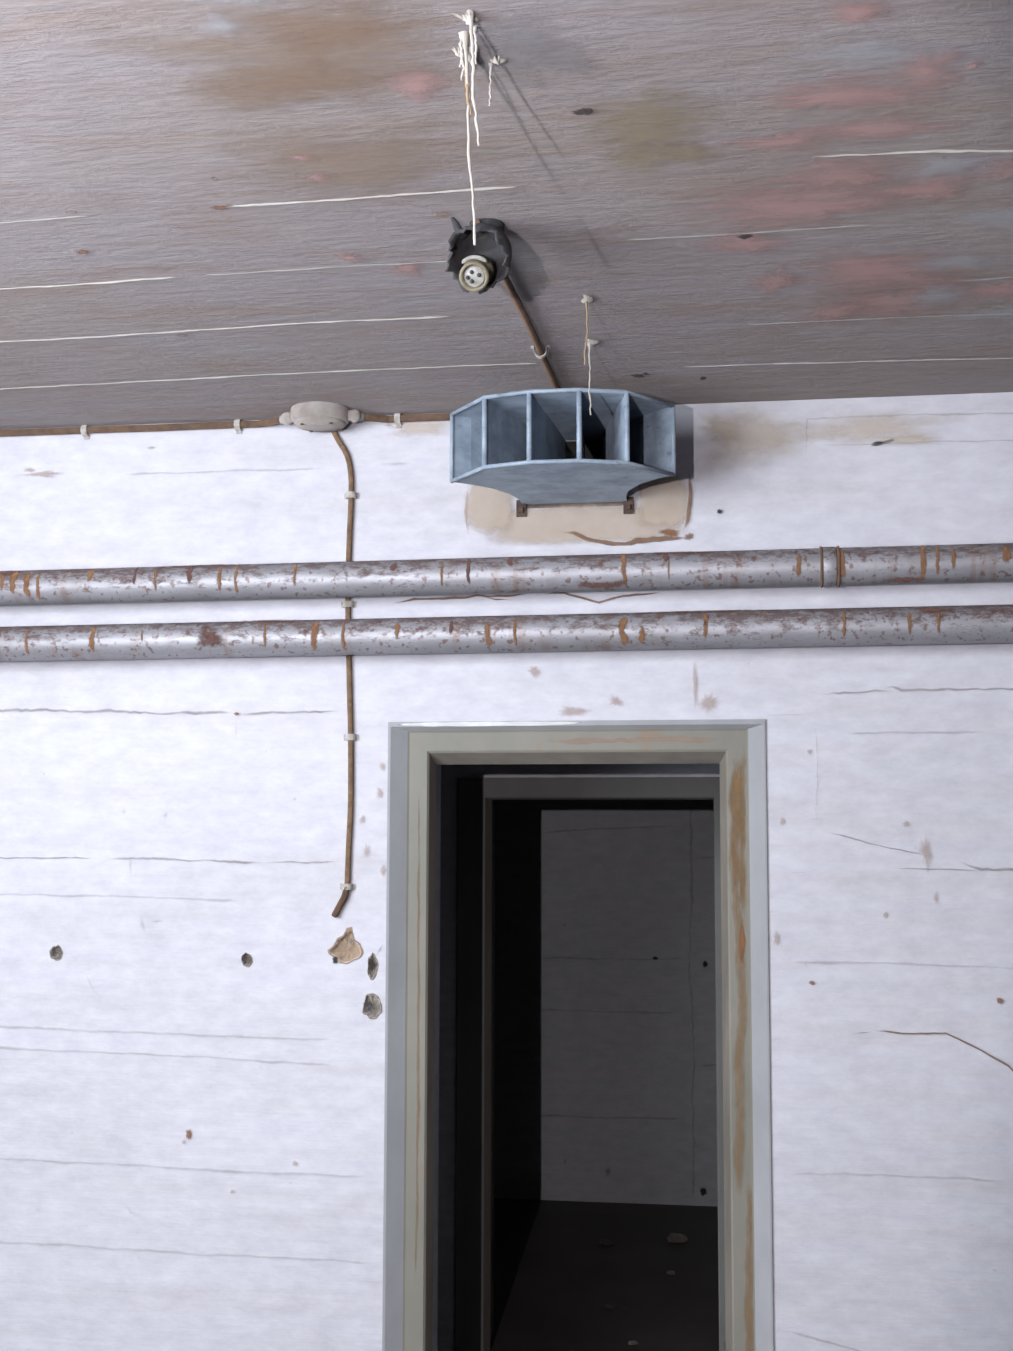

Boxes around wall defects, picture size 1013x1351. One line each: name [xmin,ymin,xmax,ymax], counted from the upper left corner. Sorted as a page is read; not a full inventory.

rust [734,863,745,975]
spalling [328,927,382,1019]
crack [862,1031,1013,1072]